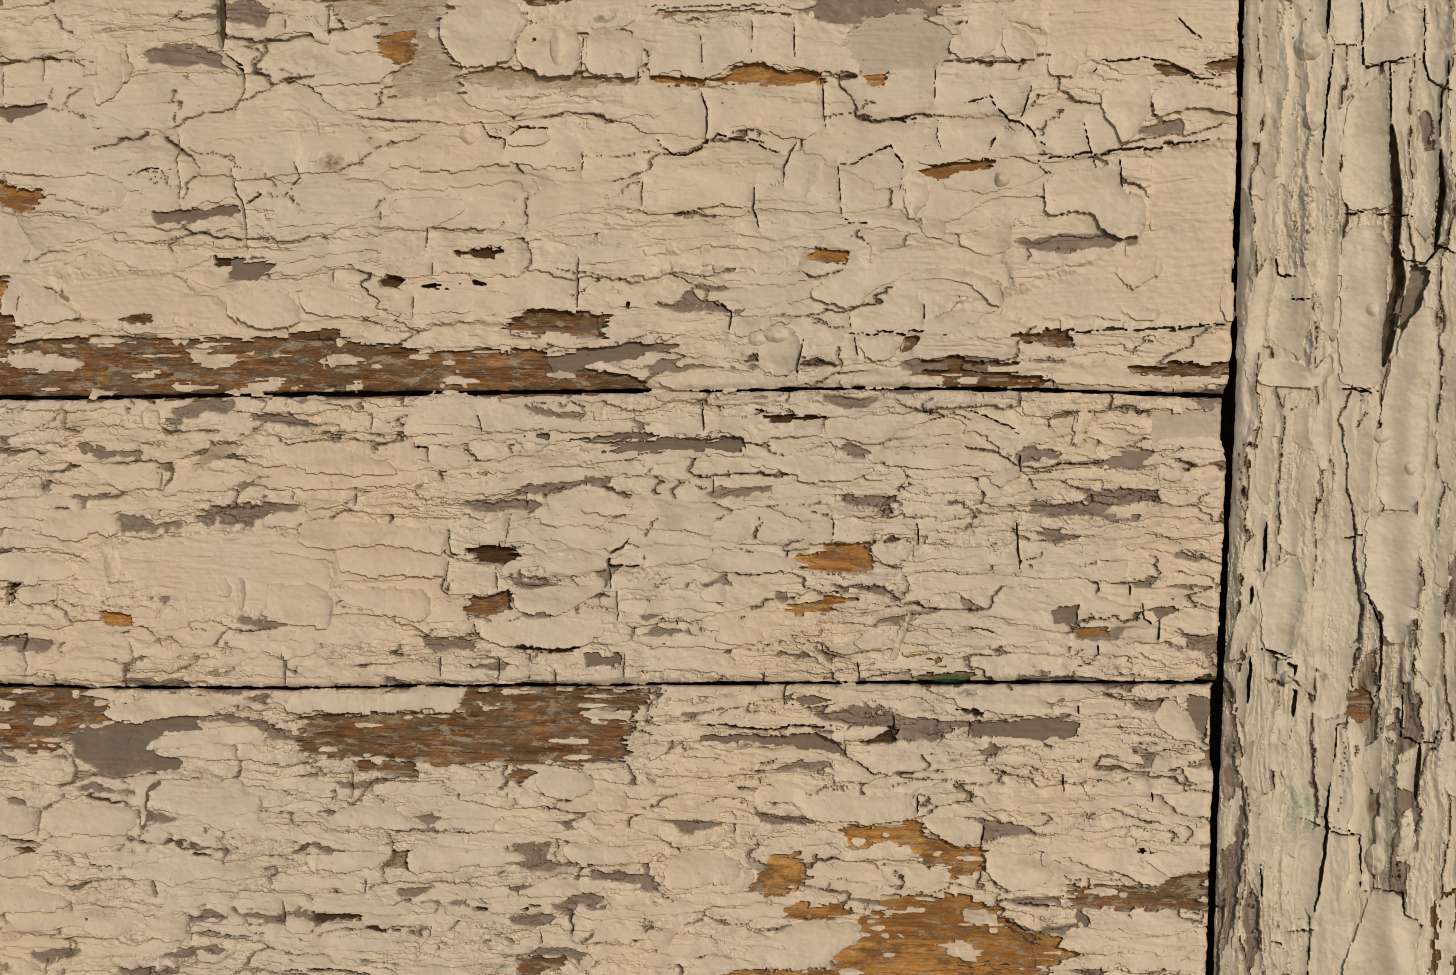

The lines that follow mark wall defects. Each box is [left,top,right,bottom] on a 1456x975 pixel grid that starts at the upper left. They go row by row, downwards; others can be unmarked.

peeling [153,0,218,42]
crack [1094,18,1213,80]
crack [658,7,796,226]
crack [838,63,1220,224]
crack [1321,0,1455,394]
crack [1275,258,1309,301]
crack [850,304,947,355]
crack [1036,323,1224,336]
peeling [259,0,1456,727]
crack [608,541,640,580]
peeling [0,168,1314,975]
crack [707,679,824,730]